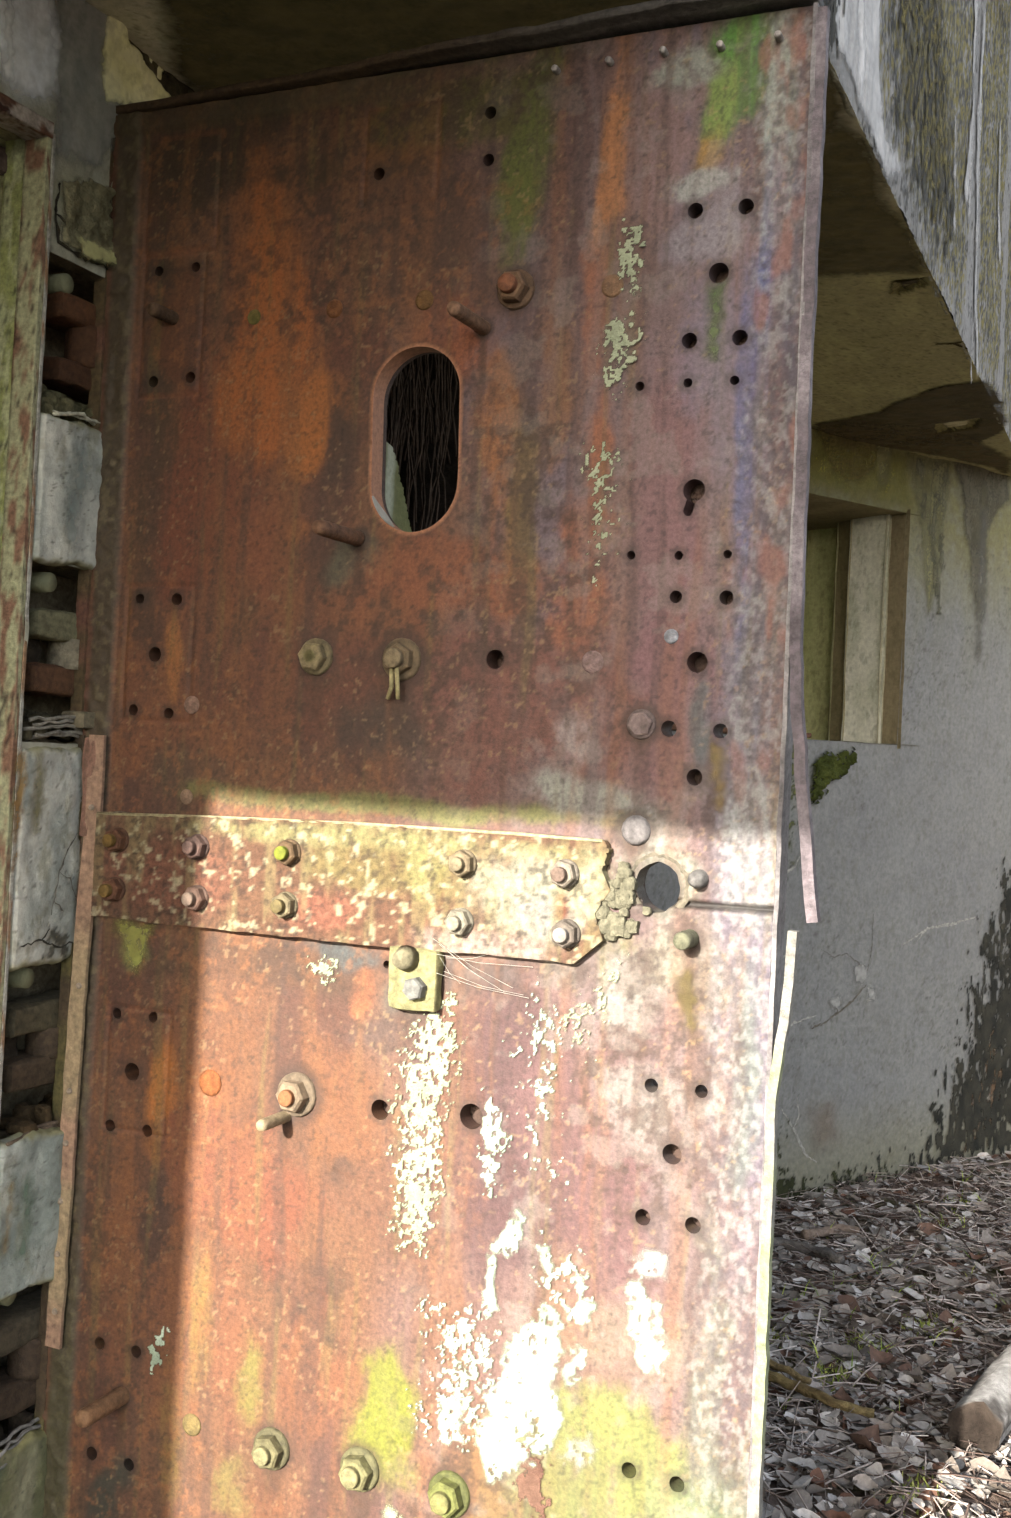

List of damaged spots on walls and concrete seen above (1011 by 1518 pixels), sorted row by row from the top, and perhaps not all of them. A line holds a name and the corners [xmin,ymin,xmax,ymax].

water stain [162,0,652,92]
rust [707,284,724,359]
water stain [811,0,1011,655]
rust [115,919,152,967]
rust [678,972,696,1027]
water stain [775,857,1011,1204]